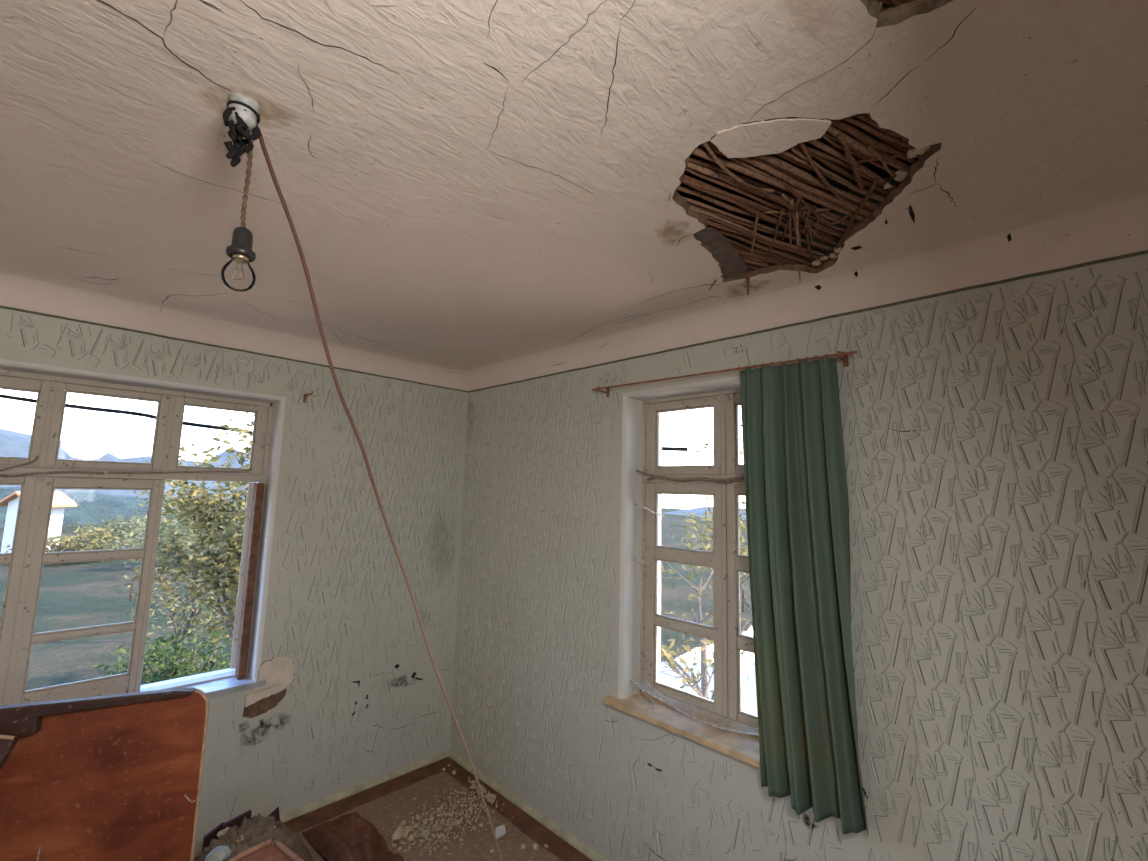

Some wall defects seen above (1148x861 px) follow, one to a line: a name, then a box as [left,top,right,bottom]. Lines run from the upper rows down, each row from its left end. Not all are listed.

crack [98,0,398,91]
crack [298,67,315,158]
crack [484,0,635,194]
crack [747,32,875,122]
spalling [860,0,953,28]
crack [871,10,974,108]
spalling [672,114,941,290]
crack [911,158,957,207]
flaking render [242,657,295,718]